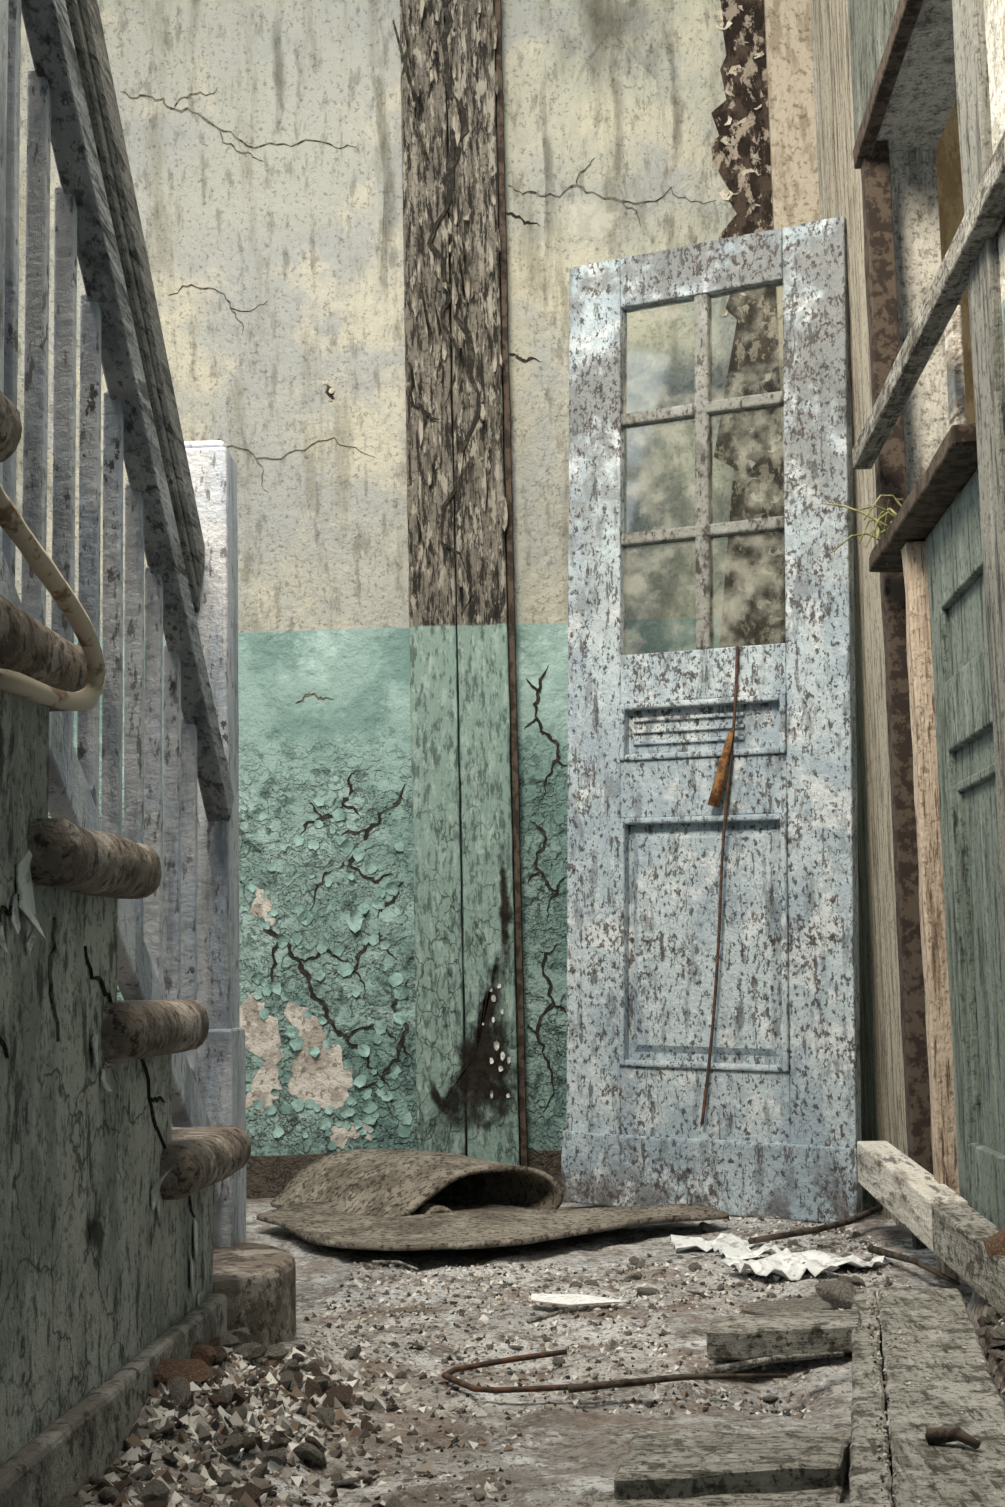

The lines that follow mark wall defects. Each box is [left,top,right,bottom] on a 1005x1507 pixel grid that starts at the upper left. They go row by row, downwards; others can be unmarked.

crack [120,87,359,161]
crack [506,158,716,226]
spalling [711,0,773,239]
spalling [714,287,786,648]
crack [0,1034,9,1058]
crack [47,917,113,1042]
crack [140,1058,166,1149]
peeling [240,797,409,1150]
crack [255,769,412,1113]
peeling [397,1111,413,1138]
leakage [430,845,517,1132]
crack [525,666,568,1110]